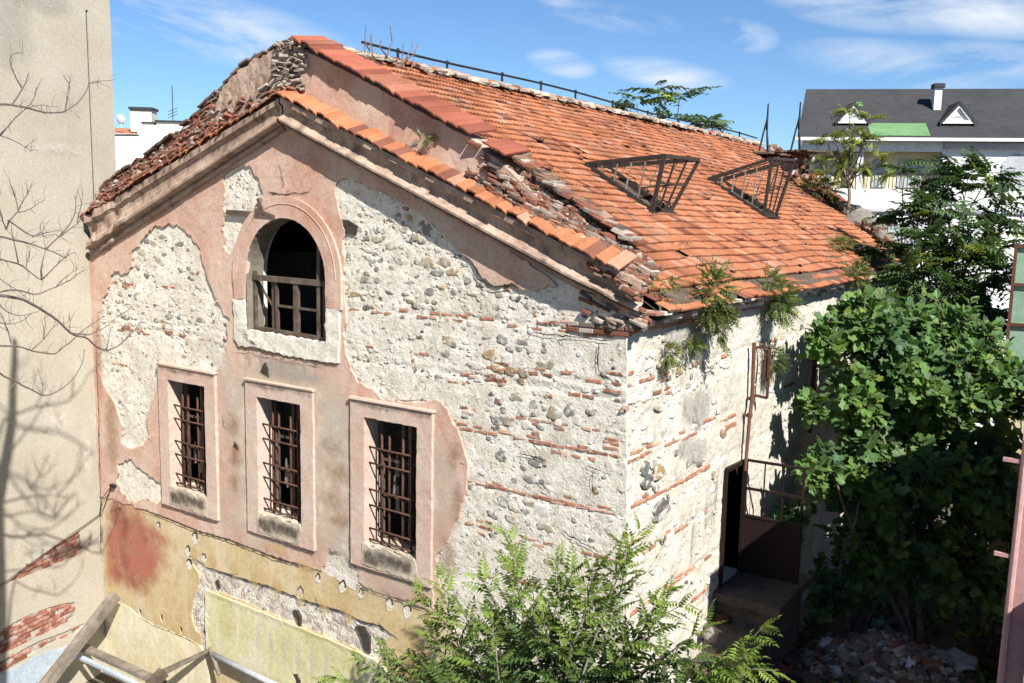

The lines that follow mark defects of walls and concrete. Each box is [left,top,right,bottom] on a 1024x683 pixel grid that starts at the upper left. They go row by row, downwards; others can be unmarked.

flaking render [221,165,263,252]
flaking render [98,224,230,582]
flaking render [336,179,737,682]
flaking render [751,305,814,515]
flaking render [0,602,84,683]
flaking render [8,532,82,582]
flaking render [185,531,394,660]